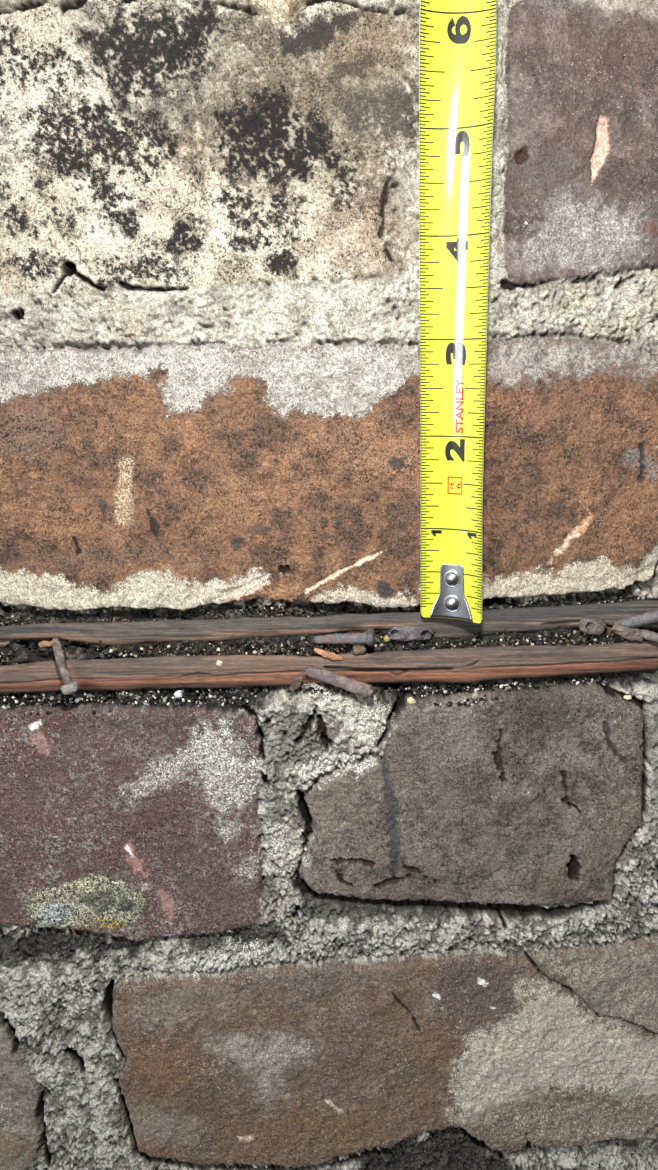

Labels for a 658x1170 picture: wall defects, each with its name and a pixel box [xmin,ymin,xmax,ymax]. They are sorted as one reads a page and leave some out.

water stain [171,0,231,75]
crack [52,263,189,294]
crack [290,789,609,929]
crack [392,992,421,1031]
crack [524,951,658,1036]